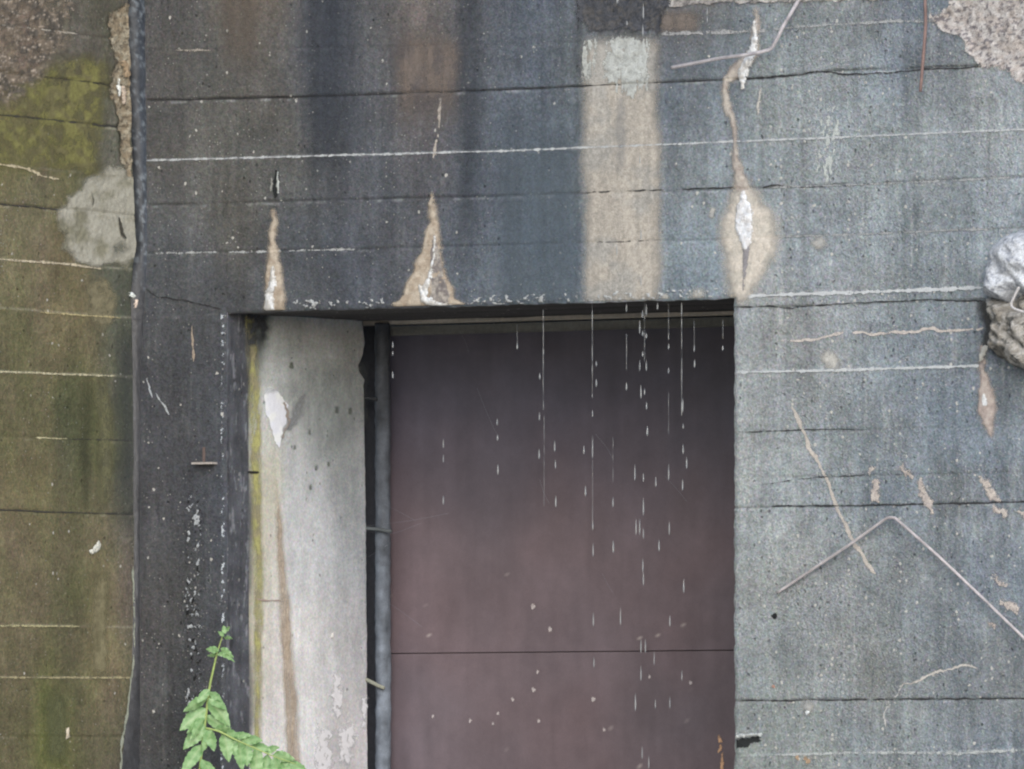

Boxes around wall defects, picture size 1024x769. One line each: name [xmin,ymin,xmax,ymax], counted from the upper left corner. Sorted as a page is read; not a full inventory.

spalling [919,0,1024,92]
peeling [58,3,136,270]
leakage [87,281,115,327]
crack [781,326,983,342]
peeling [264,389,305,448]
crack [749,406,1024,574]